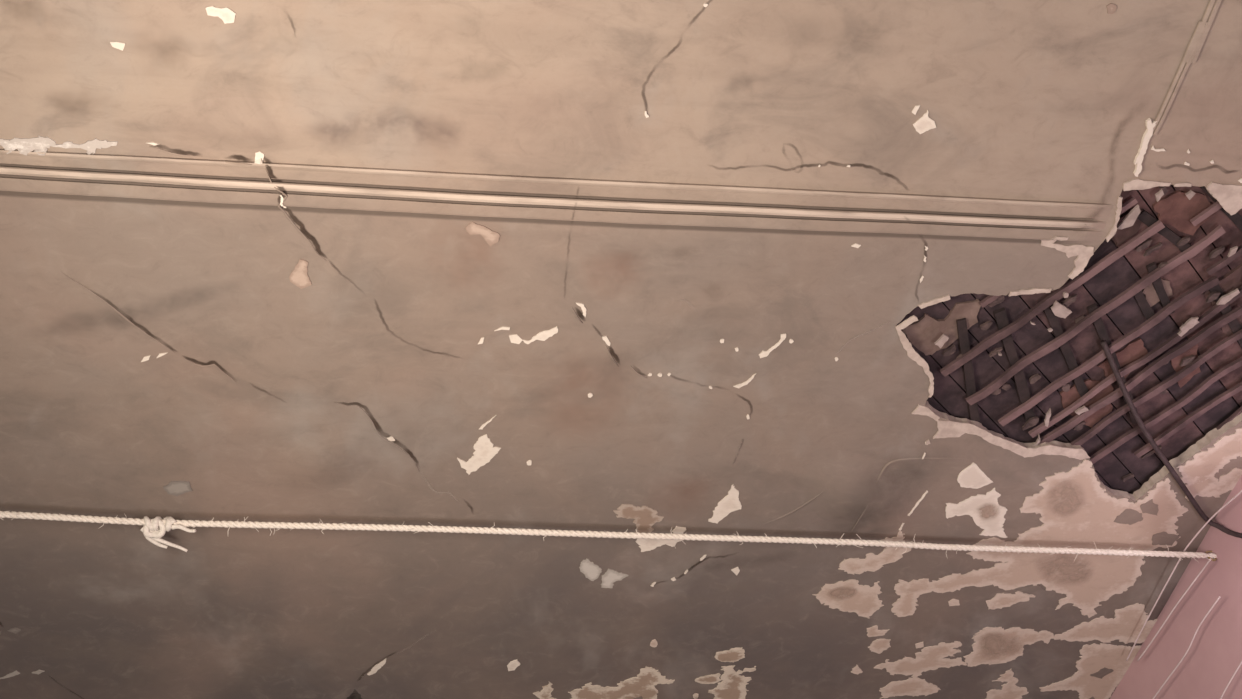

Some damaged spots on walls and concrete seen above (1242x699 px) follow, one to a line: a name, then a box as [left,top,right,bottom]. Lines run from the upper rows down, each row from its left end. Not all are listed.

peeling [912,105,936,134]
crack [806,164,892,177]
crack [62,272,236,382]
crack [572,302,671,378]
crack [709,374,756,419]
spalling [812,118,1242,699]
crack [334,402,420,472]
peeling [457,415,501,474]
peeling [708,484,742,524]
peeling [533,666,675,699]
peeling [693,647,756,699]